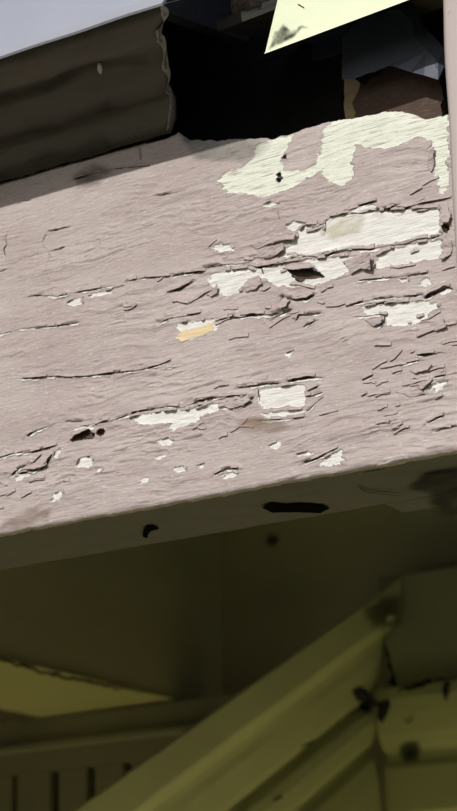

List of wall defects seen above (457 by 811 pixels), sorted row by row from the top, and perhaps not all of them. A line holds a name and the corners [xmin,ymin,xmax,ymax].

peeling [217,111,450,207]
peeling [207,204,452,308]
peeling [66,288,113,306]
peeling [361,277,454,327]
peeling [176,317,226,342]
peeling [70,423,96,436]
peeling [129,382,307,460]
peeling [15,447,64,482]
peeling [75,454,103,473]
peeling [320,449,346,467]
spalling [262,504,330,513]
crack [0,658,149,693]